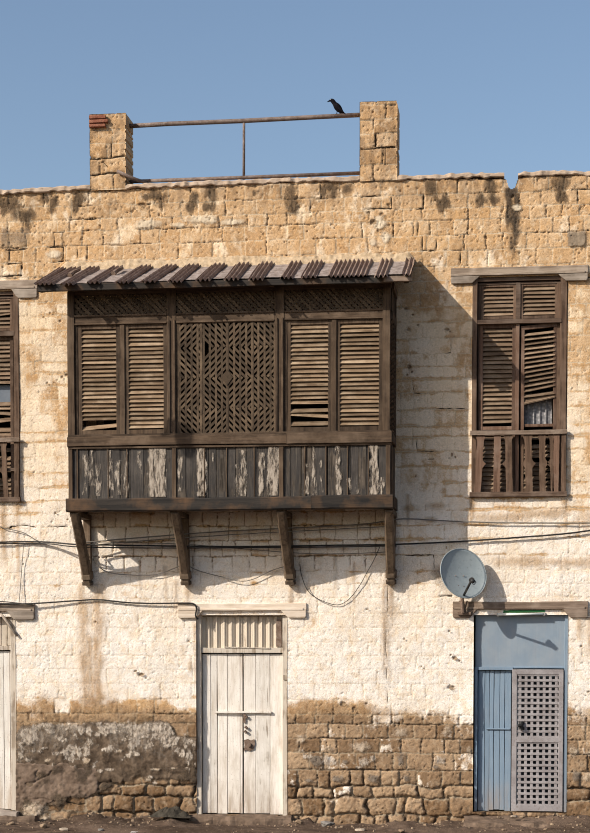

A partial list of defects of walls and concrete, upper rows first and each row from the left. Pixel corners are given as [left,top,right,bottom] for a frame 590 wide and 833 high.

leakage [0,197,35,230]
leakage [40,194,57,214]
leakage [72,191,84,212]
leakage [143,190,166,208]
leakage [185,186,216,212]
leakage [284,184,298,213]
leakage [320,182,352,198]
leakage [425,180,450,213]
leakage [475,179,519,249]
leakage [552,176,568,202]
peeling [297,735,375,769]